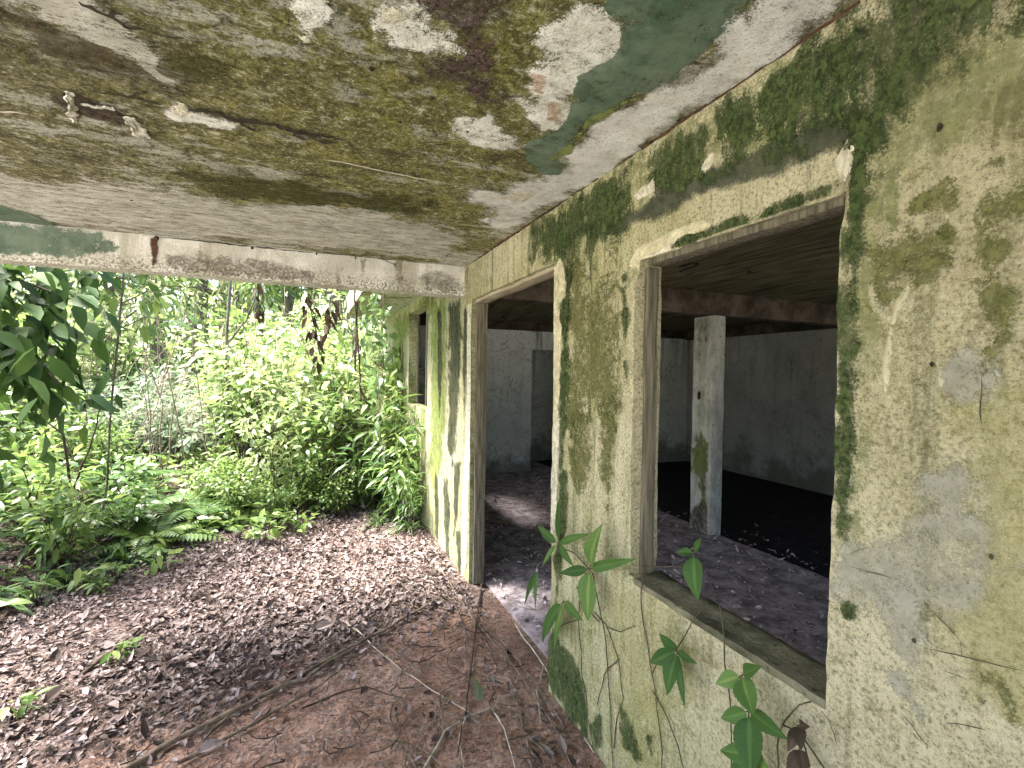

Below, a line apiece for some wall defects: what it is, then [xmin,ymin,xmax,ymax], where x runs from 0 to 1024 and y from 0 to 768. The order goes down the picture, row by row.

spalling [52,91,151,141]
peeling [8,0,237,131]
peeling [449,114,518,151]
peeling [464,0,842,232]
corrosion [150,238,158,265]
damp [434,298,467,572]